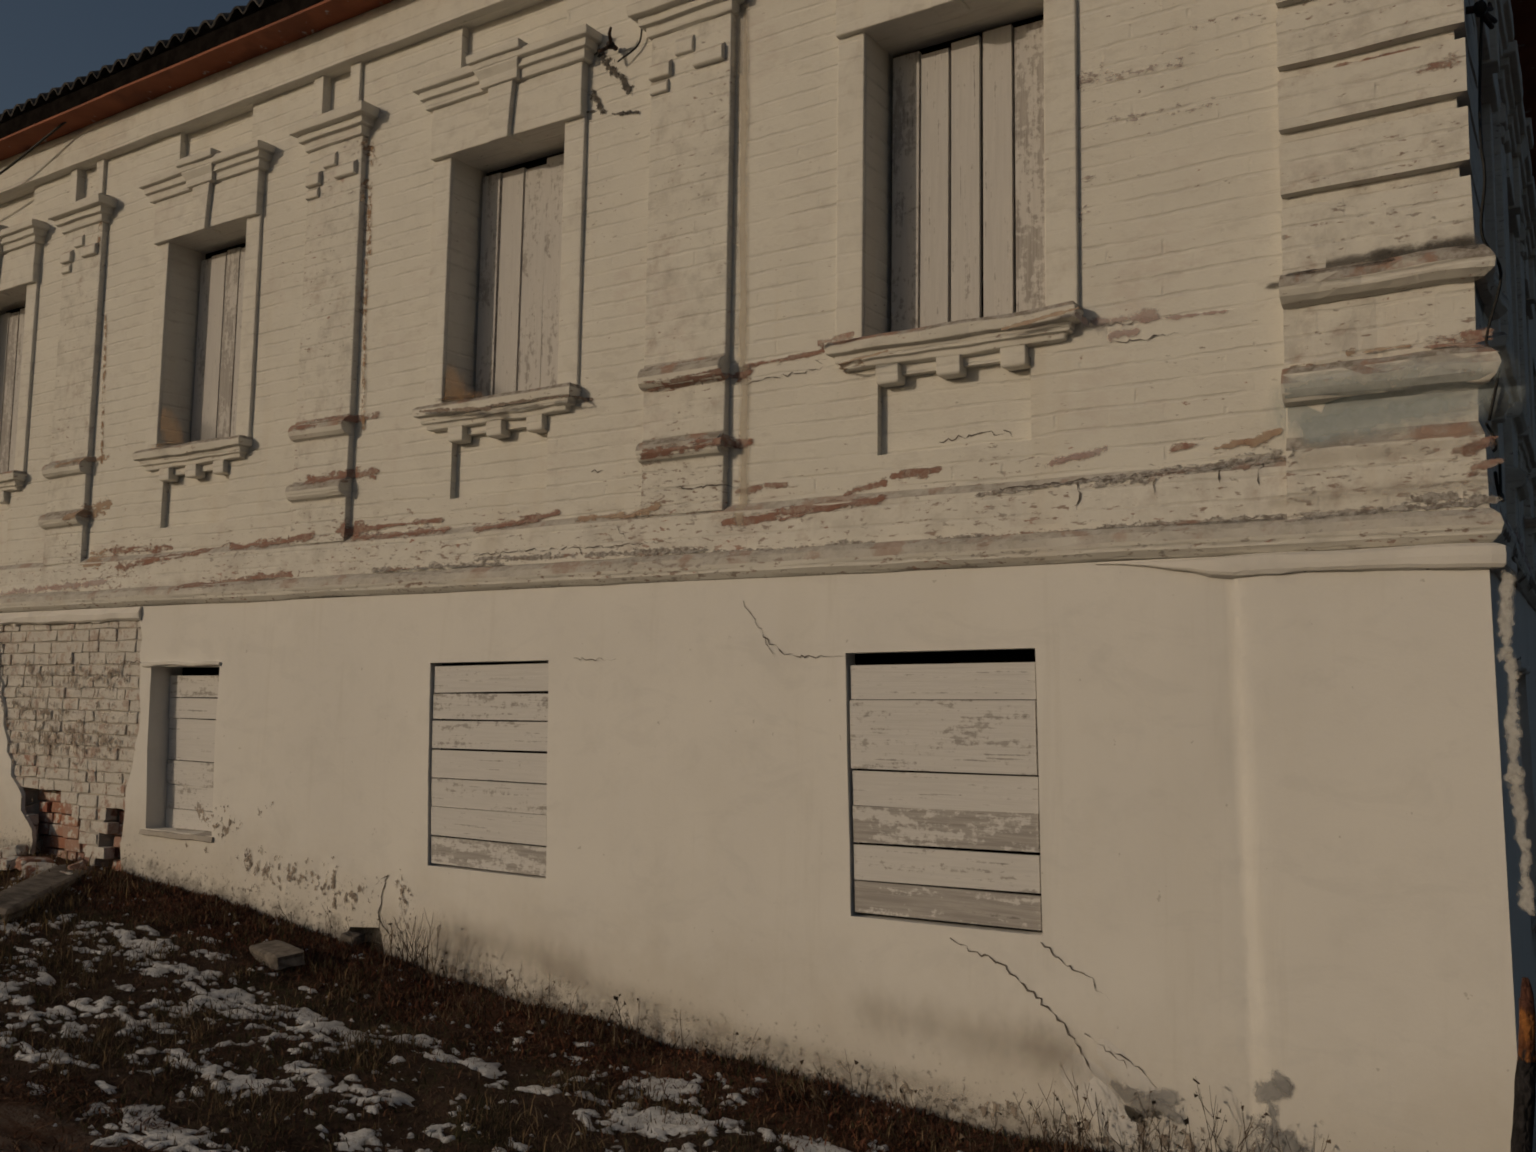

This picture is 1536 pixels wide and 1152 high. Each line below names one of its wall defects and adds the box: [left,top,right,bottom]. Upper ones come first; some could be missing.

peeling [1001,307,1227,342]
peeling [295,411,379,431]
peeling [639,434,753,460]
peeling [303,467,380,484]
peeling [721,466,942,526]
peeling [335,517,451,541]
peeling [473,501,662,533]
peeling [0,532,315,595]
peeling [371,539,876,572]
crack [743,601,842,658]
spalling [0,606,142,871]
crack [950,938,1153,1085]